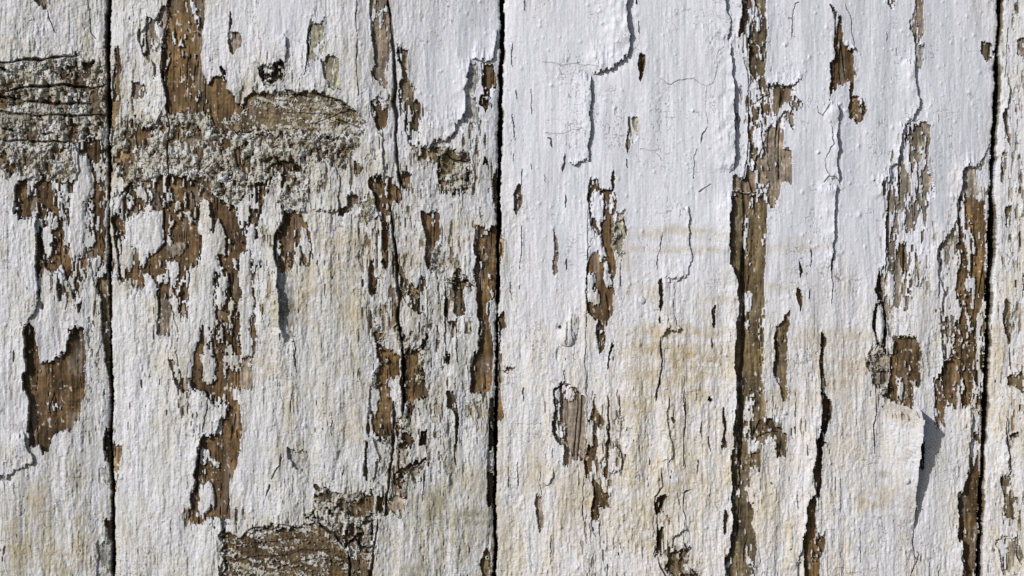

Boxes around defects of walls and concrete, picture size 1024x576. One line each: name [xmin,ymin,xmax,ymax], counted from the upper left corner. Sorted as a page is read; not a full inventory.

crack [543,60,599,68]
crack [817,103,841,185]
peeling [827,5,866,178]
peeling [0,0,513,576]
peeling [586,172,627,361]
peeling [712,0,803,576]
peeling [865,0,989,576]
peeling [535,383,622,532]
crack [653,232,711,576]